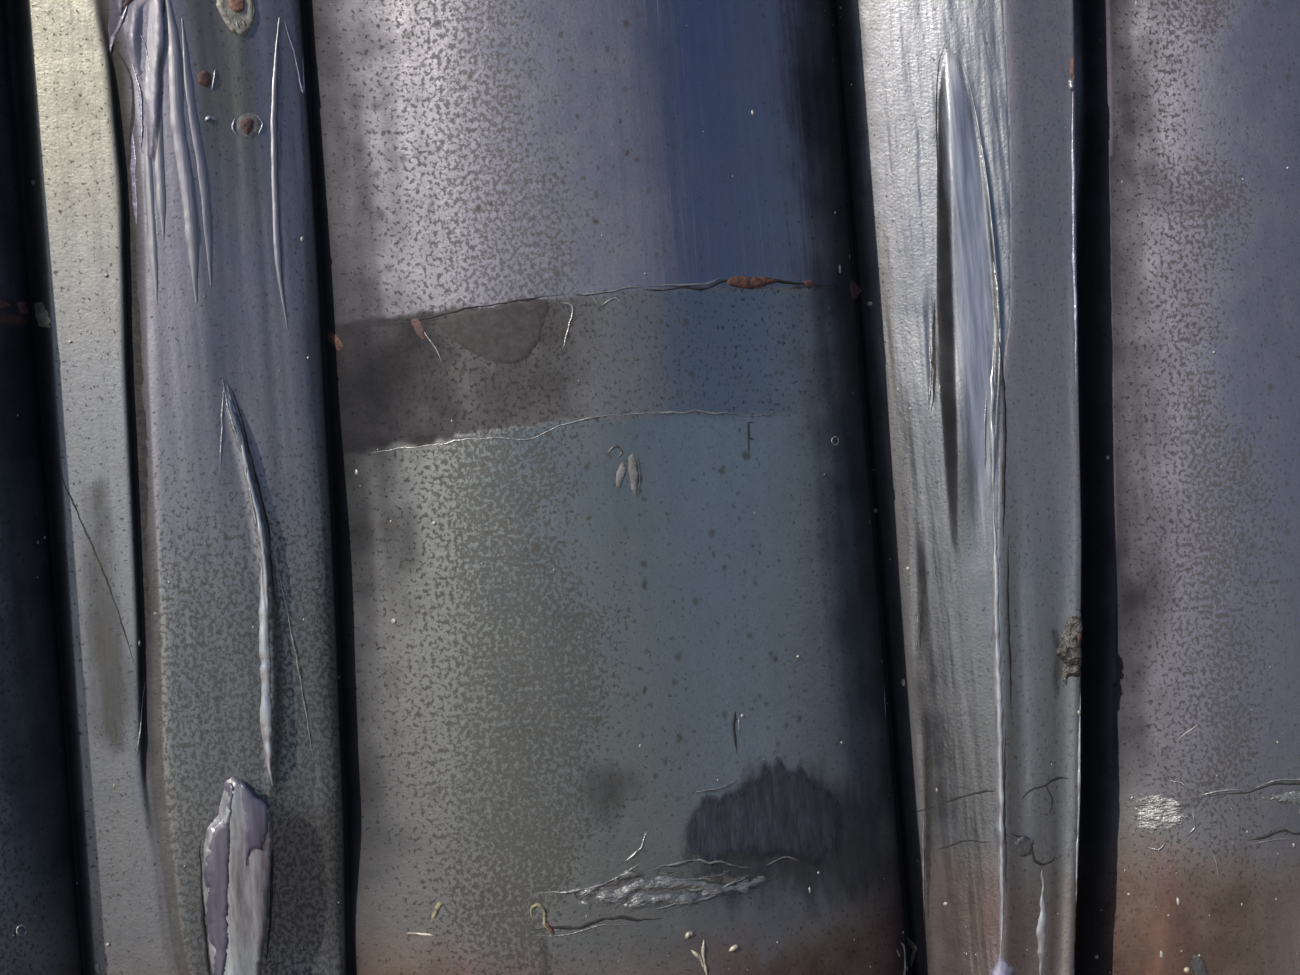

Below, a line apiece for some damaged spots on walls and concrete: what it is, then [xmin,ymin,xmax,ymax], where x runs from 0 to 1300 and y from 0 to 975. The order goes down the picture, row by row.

rust [216,0,255,36]
rust [197,70,216,88]
rust [232,113,263,138]
crack [1202,778,1300,798]
crack [1247,829,1300,844]
spalling [199,776,274,975]
crack [529,915,663,937]